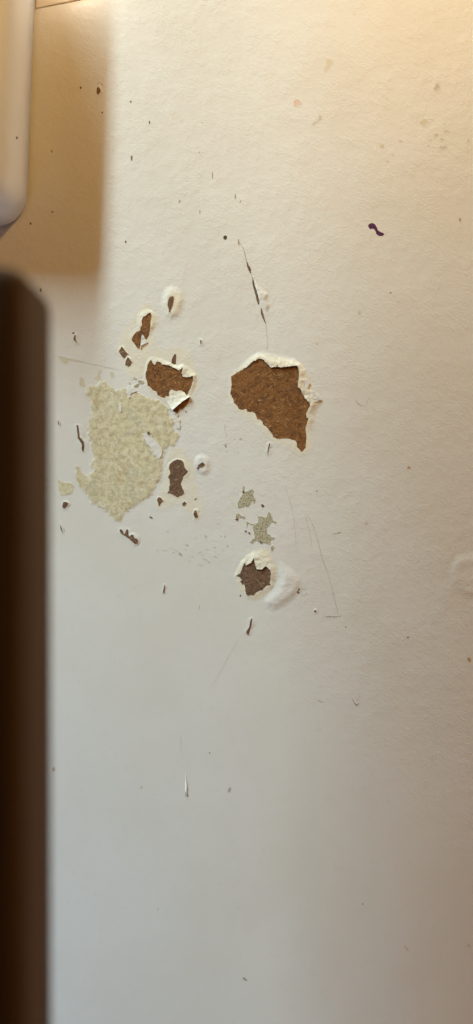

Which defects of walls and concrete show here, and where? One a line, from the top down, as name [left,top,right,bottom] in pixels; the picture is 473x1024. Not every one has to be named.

crack [238,239,268,349]
peeling [56,309,201,547]
peeling [227,351,323,457]
peeling [234,485,278,602]